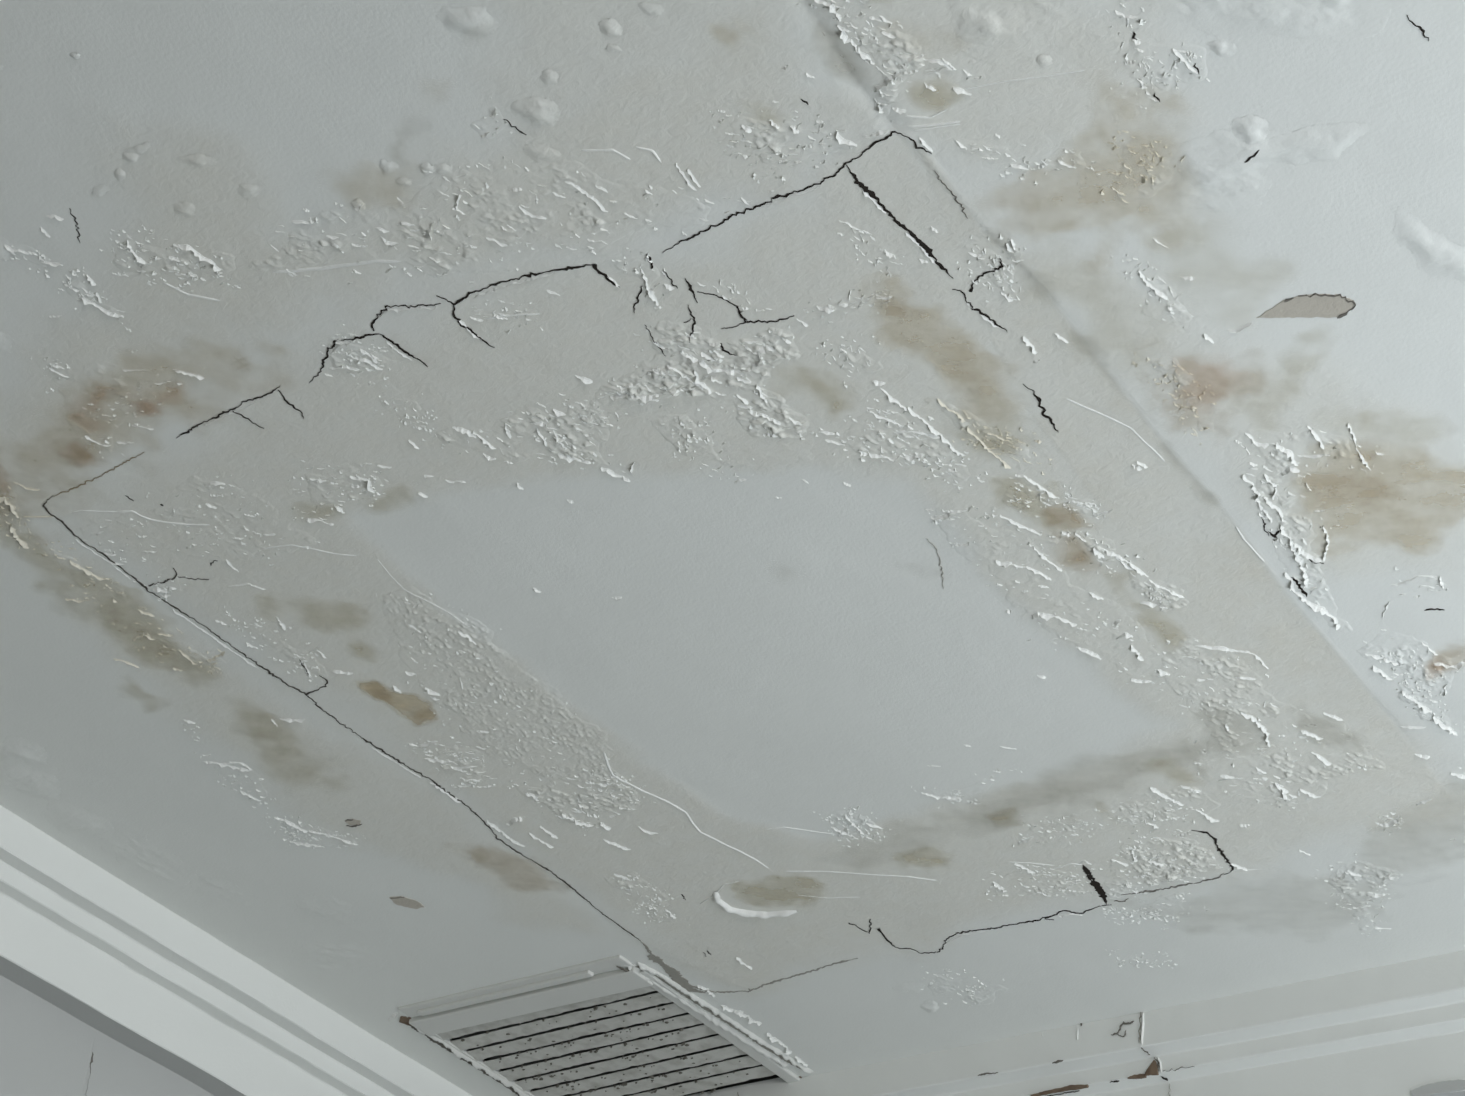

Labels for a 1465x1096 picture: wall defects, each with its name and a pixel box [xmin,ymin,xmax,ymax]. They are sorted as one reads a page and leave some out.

peeling [709,0,1101,193]
peeling [1108,0,1210,109]
peeling [4,208,131,332]
peeling [99,225,240,301]
crack [177,131,1007,438]
peeling [31,350,206,458]
crack [1023,384,1058,431]
peeling [319,221,1386,850]
peeling [1234,423,1465,736]
damp [360,682,435,724]
crack [42,452,1248,993]
peeling [975,828,1231,902]